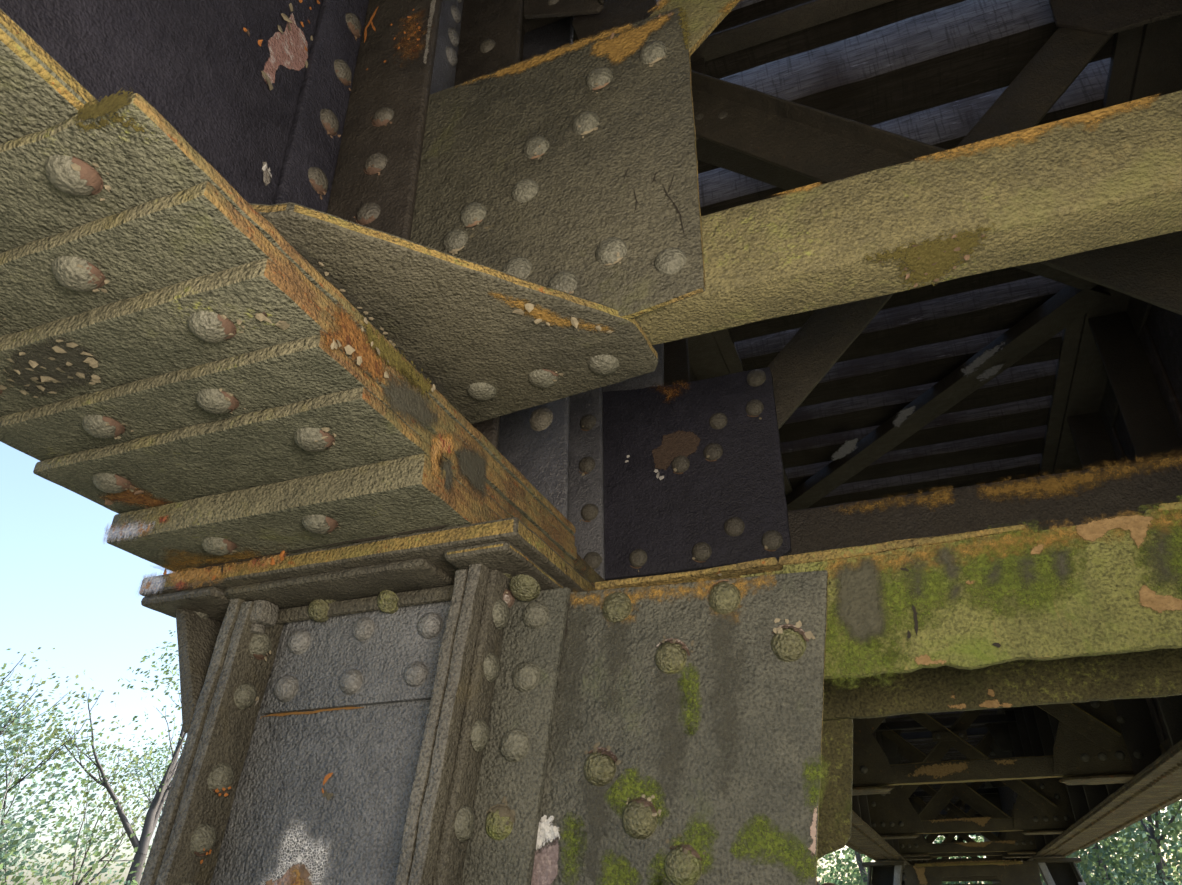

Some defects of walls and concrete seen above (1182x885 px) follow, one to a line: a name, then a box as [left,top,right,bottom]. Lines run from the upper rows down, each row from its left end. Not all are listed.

peeling [243,0,320,91]
corrosion [464,0,673,84]
corrosion [431,433,454,477]
corrosion [979,453,1182,498]
corrosion [849,487,953,512]
peeling [1076,514,1153,548]
corrosion [163,551,286,590]
peeling [1139,585,1182,613]
peeling [266,864,312,885]